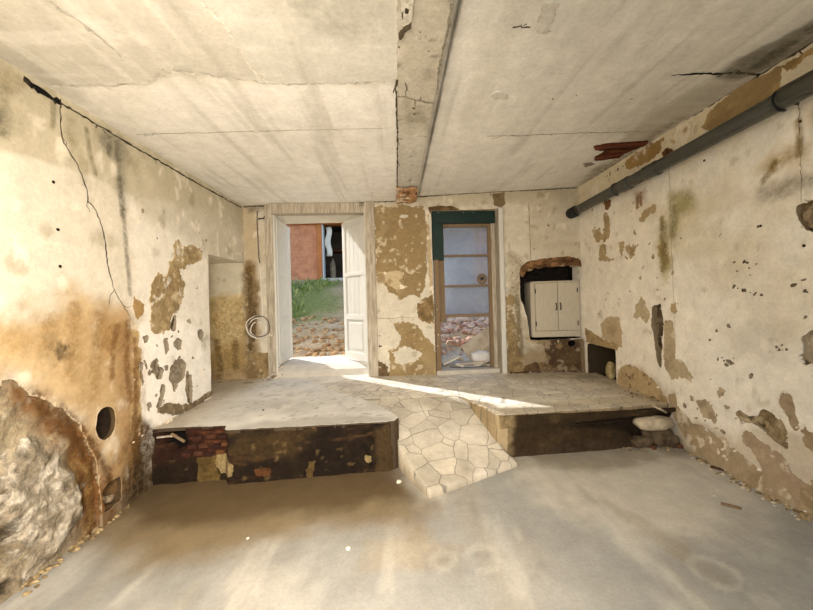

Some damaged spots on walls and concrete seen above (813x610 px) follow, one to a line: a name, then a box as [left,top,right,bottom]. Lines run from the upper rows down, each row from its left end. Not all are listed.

spalling [0,379,97,605]
crack [23,76,264,316]
peeling [127,239,213,447]
damp [212,266,258,380]
crack [319,3,454,203]
spalling [397,0,414,48]
peeling [374,187,459,376]
peeling [592,199,674,283]
peeling [631,194,656,222]
peeling [604,47,813,177]
peeling [617,296,813,518]
crack [672,42,813,120]